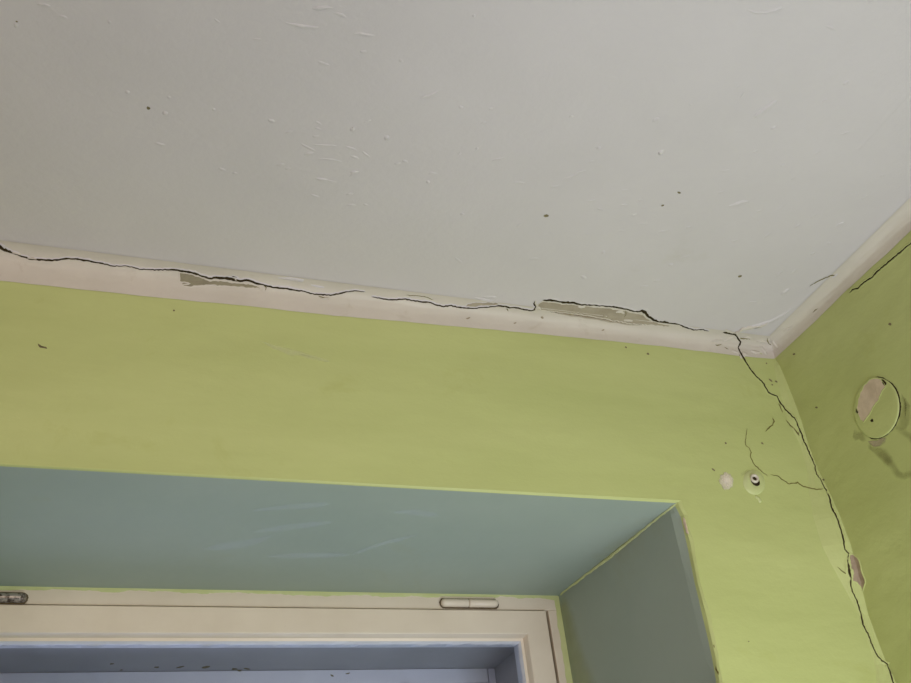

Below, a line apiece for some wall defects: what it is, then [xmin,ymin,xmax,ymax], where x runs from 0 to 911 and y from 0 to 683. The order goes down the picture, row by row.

crack [810,241,911,294]
spalling [537,301,673,327]
peeling [856,379,886,422]
crack [0,243,896,683]